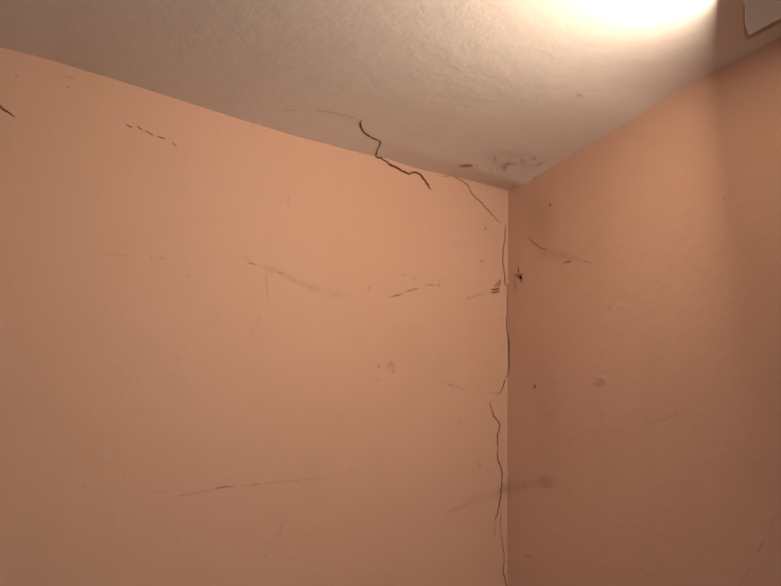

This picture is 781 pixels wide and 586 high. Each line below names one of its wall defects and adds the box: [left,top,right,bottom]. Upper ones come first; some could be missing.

crack [360,121,430,189]
crack [490,224,510,519]